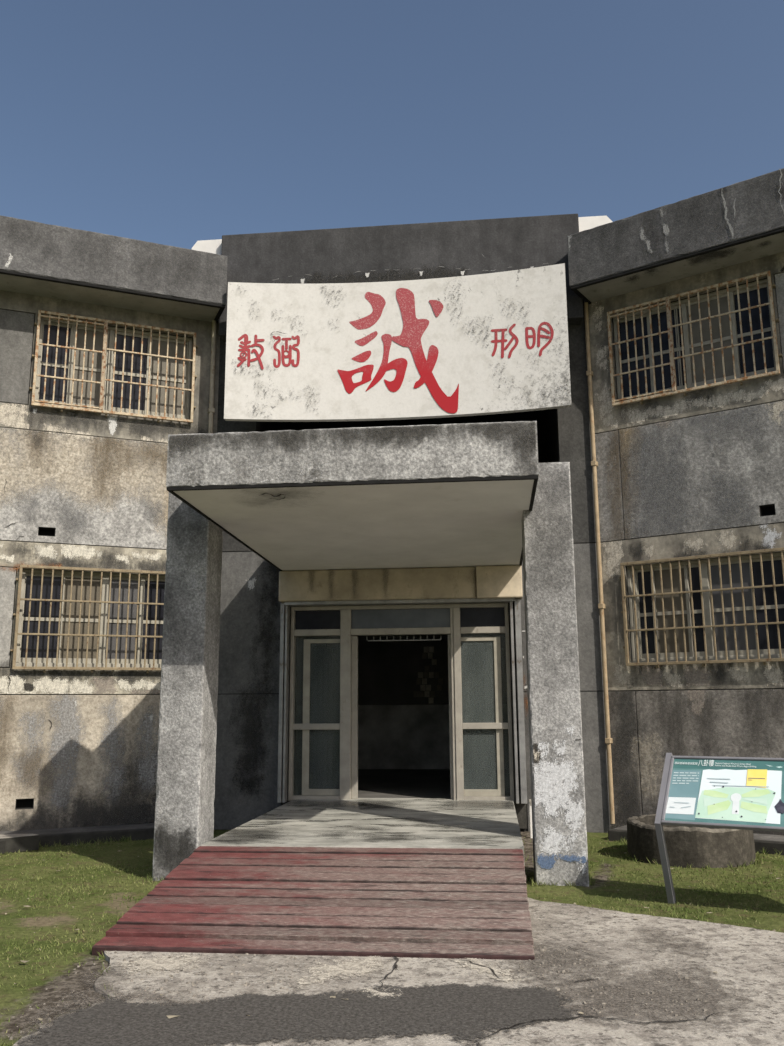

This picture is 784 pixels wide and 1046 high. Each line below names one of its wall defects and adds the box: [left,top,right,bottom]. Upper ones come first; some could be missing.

crack [721,191,736,238]
leakage [45,555,166,575]
leakage [629,542,644,560]
leakage [0,665,86,681]
leakage [100,670,161,682]
leakage [0,695,195,876]
crack [379,956,399,989]
crack [475,1007,741,1046]